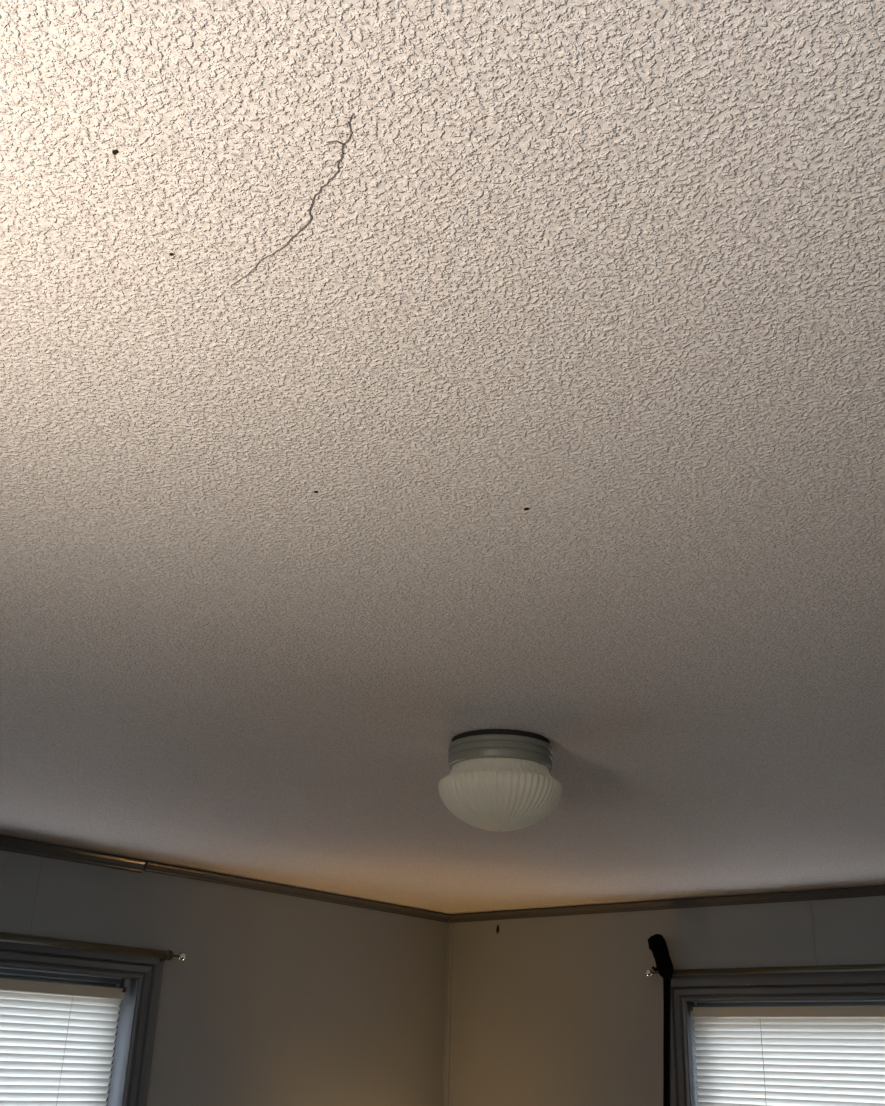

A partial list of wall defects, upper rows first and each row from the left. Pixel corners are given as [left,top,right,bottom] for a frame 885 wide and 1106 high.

crack [231,114,353,286]